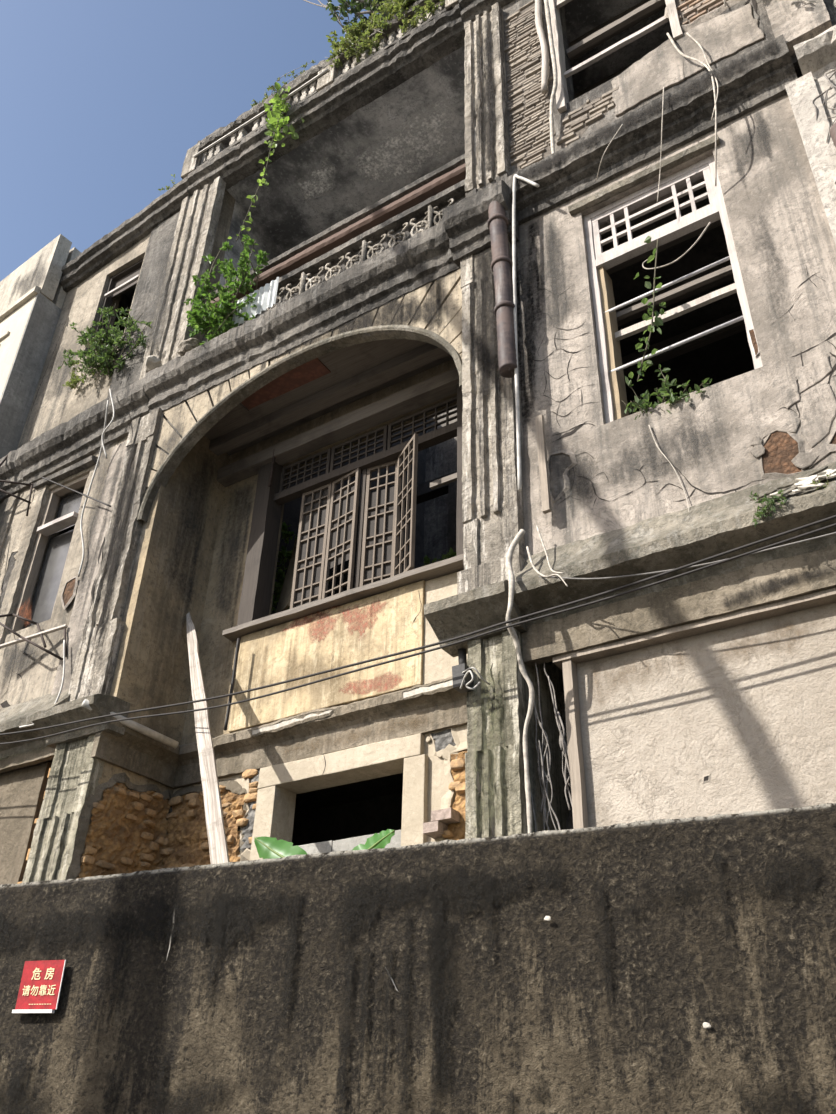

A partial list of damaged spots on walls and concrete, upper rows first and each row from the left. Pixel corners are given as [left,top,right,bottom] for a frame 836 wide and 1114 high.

flaking render [503,0,765,170]
crack [526,286,766,506]
peeling [750,354,836,501]
spalling [65,772,203,880]
spalling [218,769,260,861]
water stain [0,886,302,1038]
water stain [334,864,562,1114]